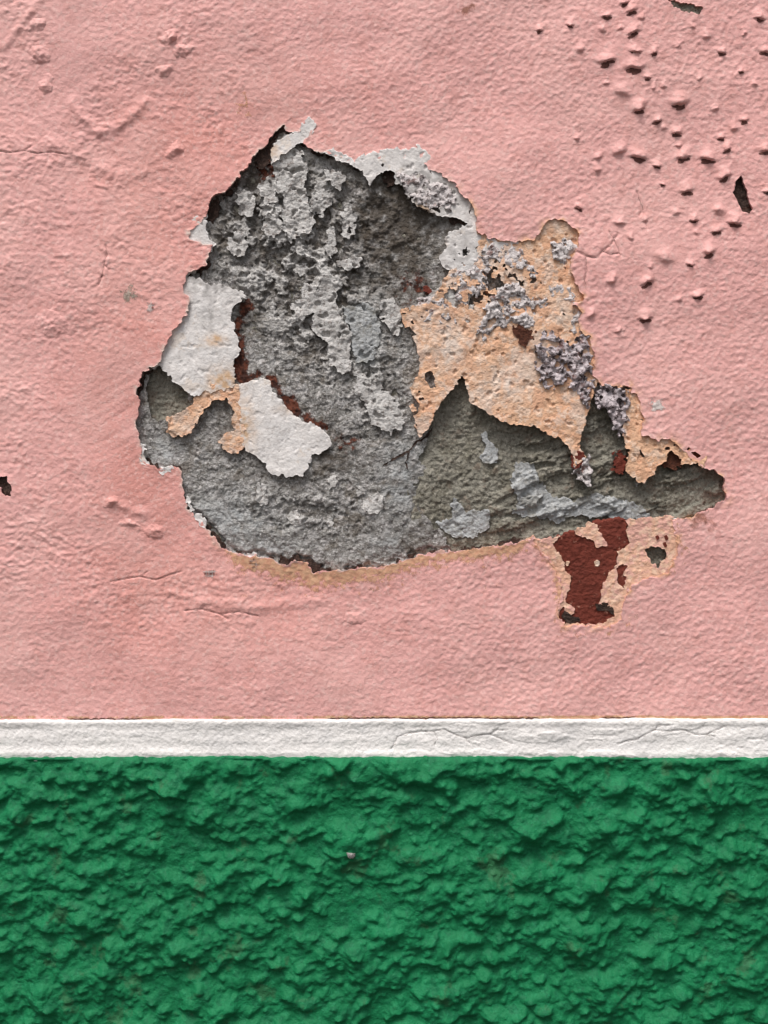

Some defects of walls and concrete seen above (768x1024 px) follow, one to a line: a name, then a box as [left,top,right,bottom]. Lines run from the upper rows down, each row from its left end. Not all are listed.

spalling [668,0,703,15]
spalling [733,177,752,213]
spalling [136,117,725,628]
spalling [0,476,12,496]
crack [329,717,537,748]